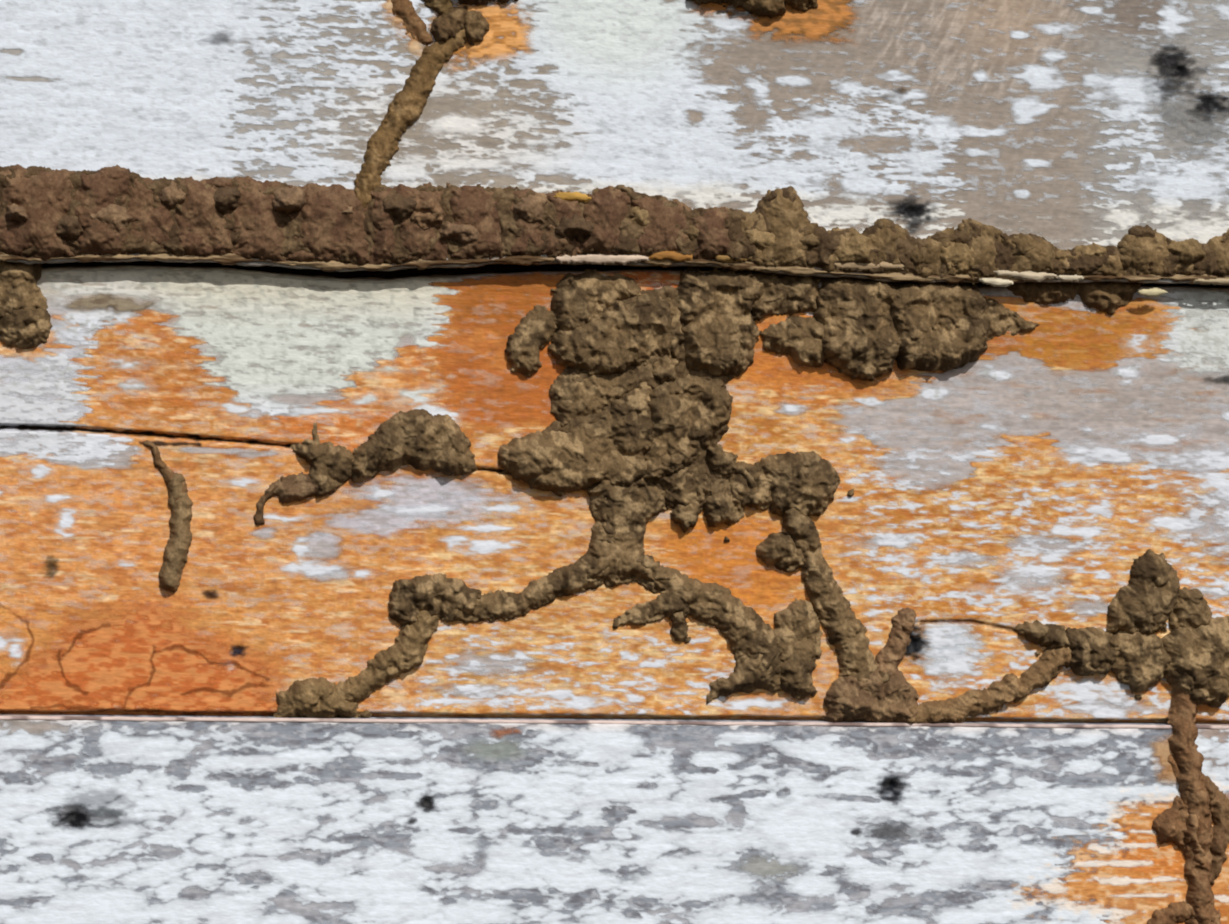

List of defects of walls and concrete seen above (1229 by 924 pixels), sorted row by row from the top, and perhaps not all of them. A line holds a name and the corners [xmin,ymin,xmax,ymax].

peeling [0,0,438,189]
peeling [381,0,1229,247]
crack [0,425,291,448]
peeling [0,269,1229,924]